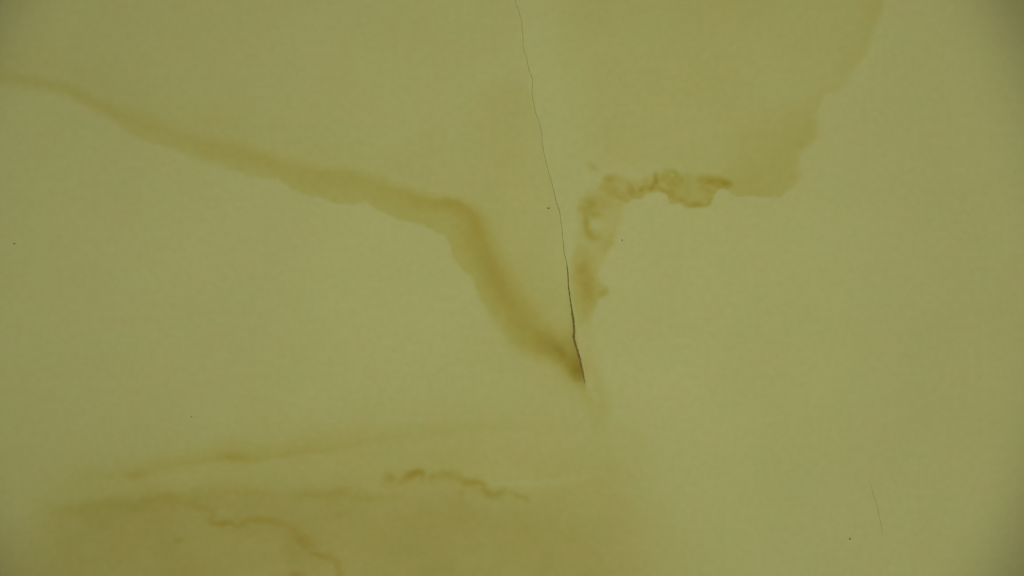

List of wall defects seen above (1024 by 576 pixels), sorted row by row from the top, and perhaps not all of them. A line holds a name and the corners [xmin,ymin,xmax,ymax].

water stain [0,0,890,490]
crack [515,0,586,384]
water stain [0,320,779,576]